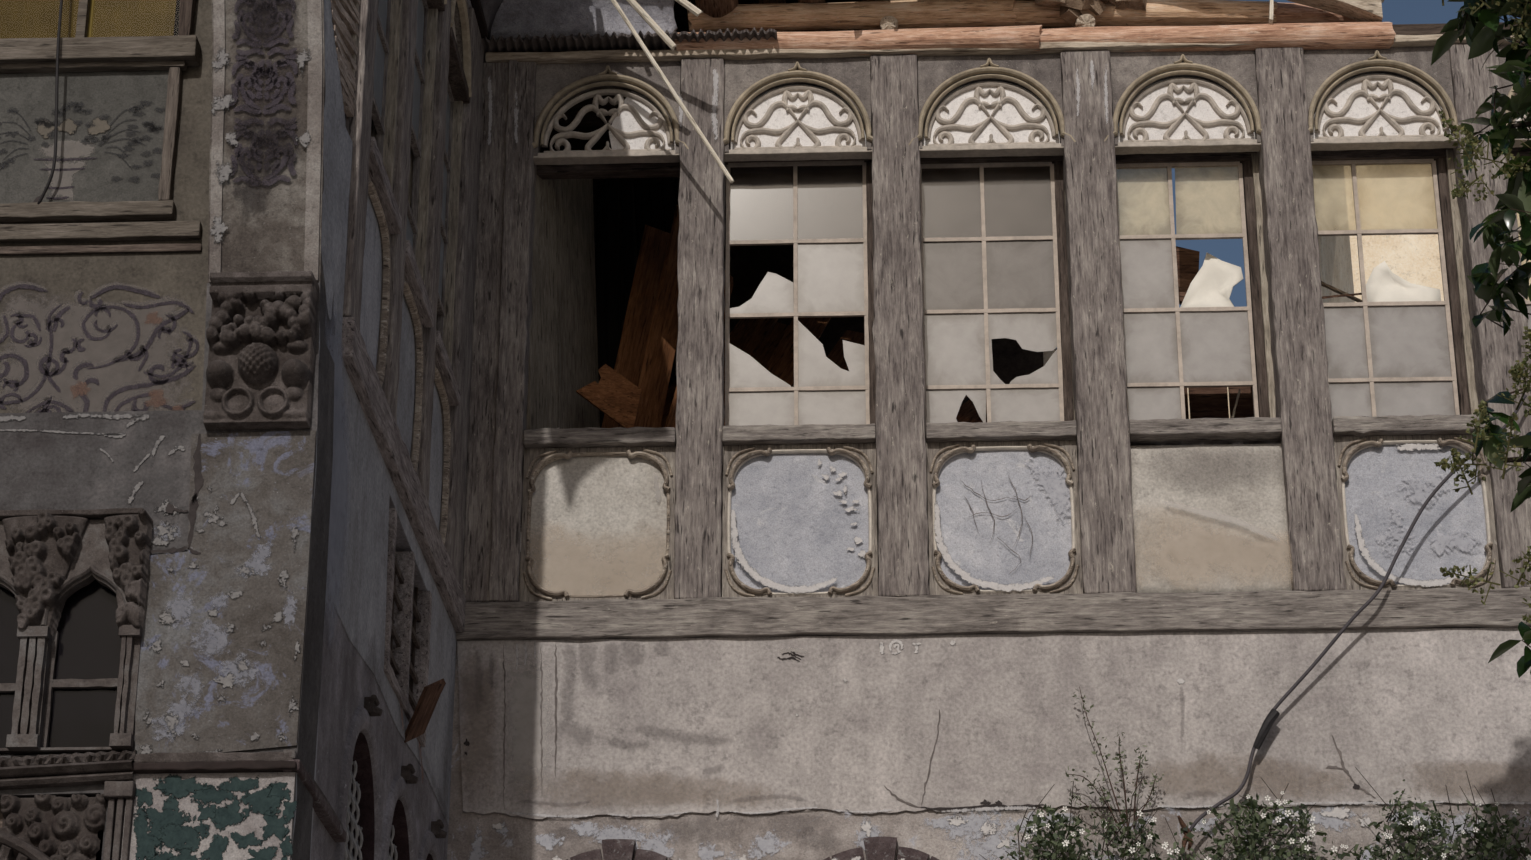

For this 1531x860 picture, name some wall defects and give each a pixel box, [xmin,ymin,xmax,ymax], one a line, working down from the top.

spalling [151,485,227,546]
crack [933,457,1071,592]
peeling [140,543,299,754]
peeling [133,774,299,860]
peeling [468,800,817,860]
peeling [832,809,894,860]
peeling [924,806,1075,860]